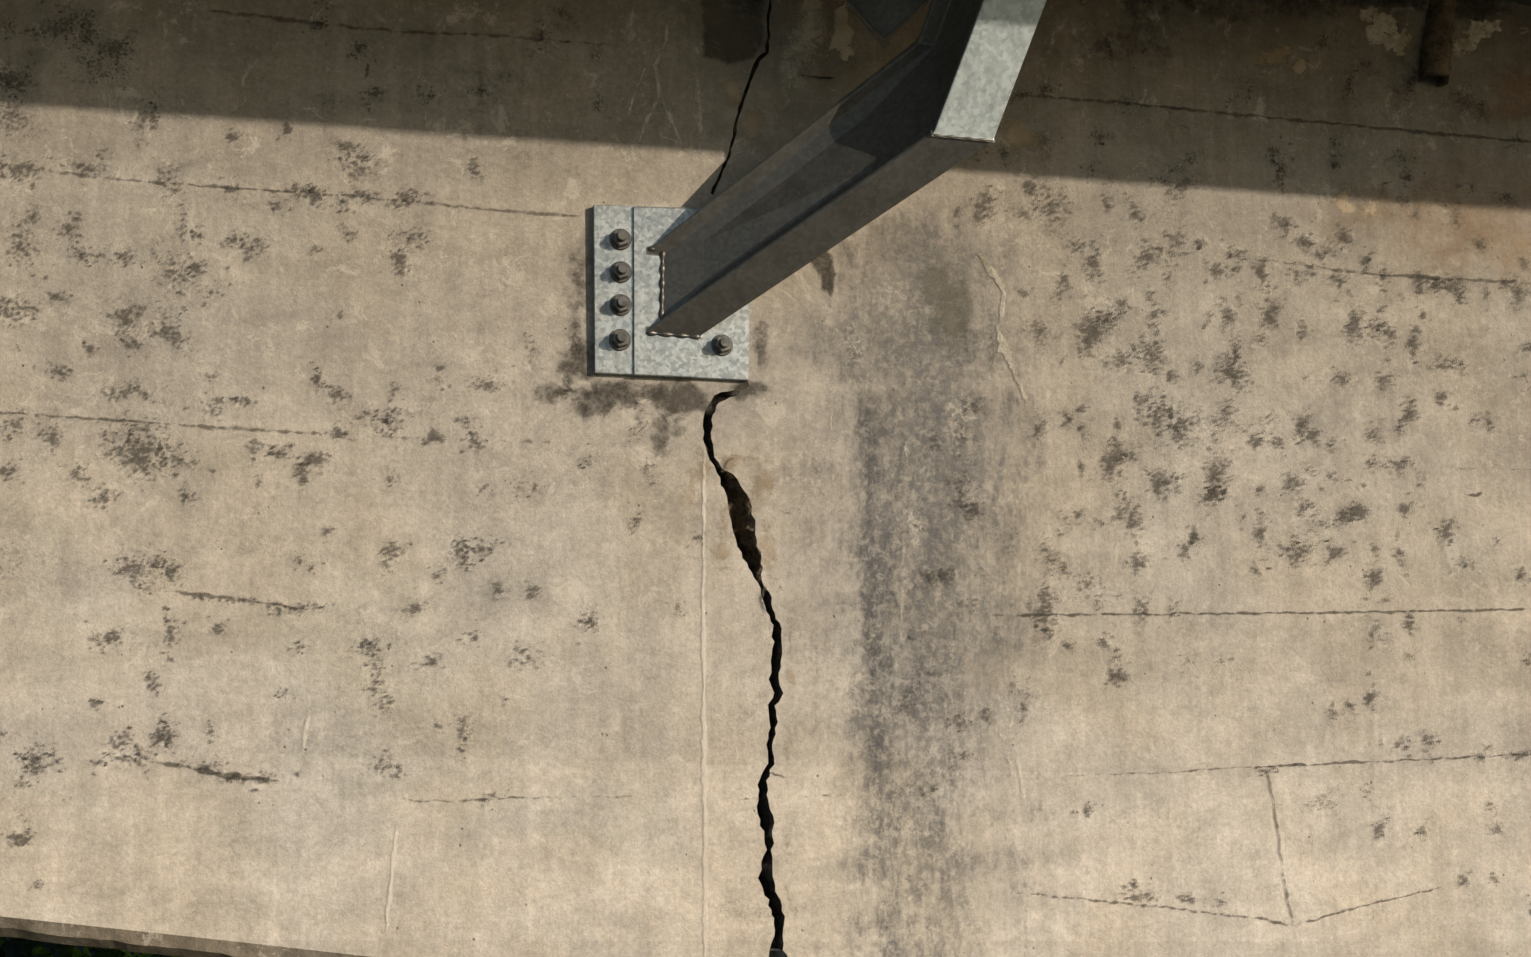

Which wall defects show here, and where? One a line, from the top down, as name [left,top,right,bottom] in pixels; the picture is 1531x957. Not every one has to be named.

crack [711,0,772,195]
damp [4,371,258,509]
damp [246,367,414,485]
damp [537,322,712,485]
damp [861,224,1028,801]
damp [955,150,1530,687]
damp [104,546,186,661]
crack [684,381,794,957]
damp [1,817,34,846]
damp [14,732,66,789]
damp [90,713,276,791]
crack [1038,776,1433,925]